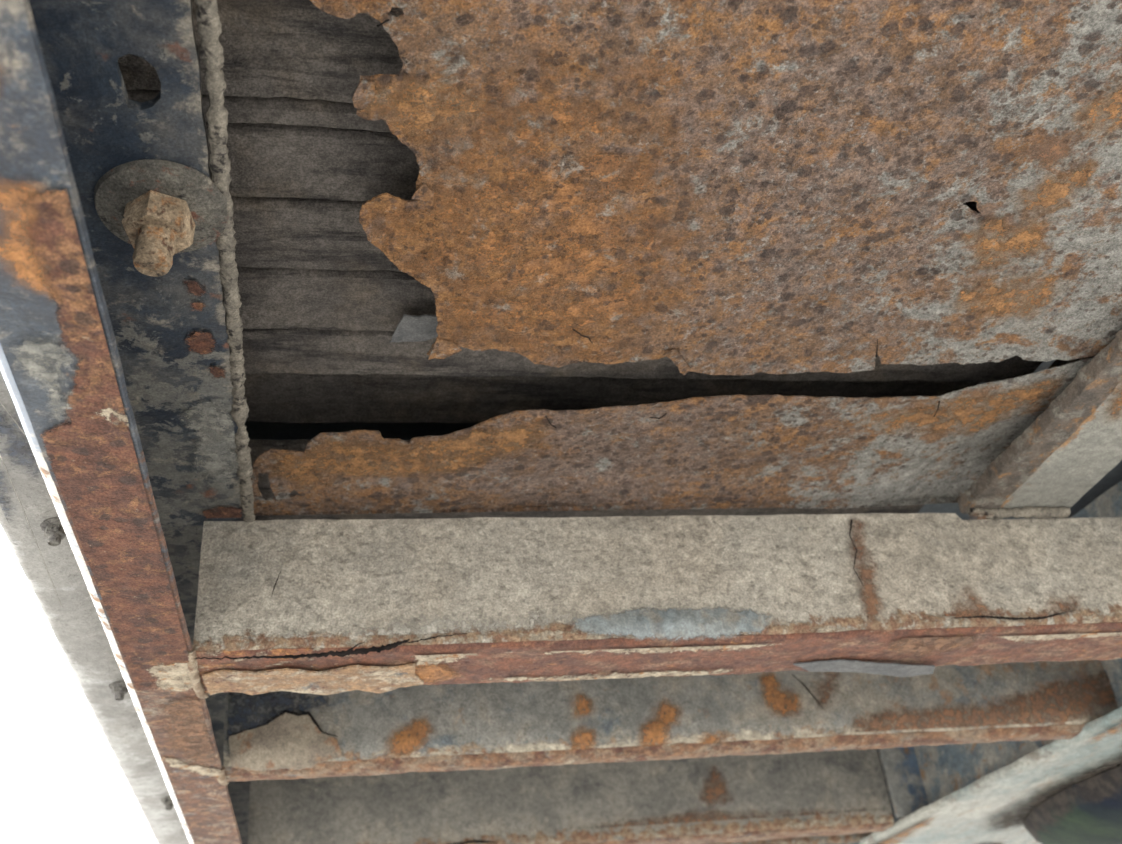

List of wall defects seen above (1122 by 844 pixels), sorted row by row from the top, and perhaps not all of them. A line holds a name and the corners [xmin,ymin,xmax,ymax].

peeling [352,80,375,109]
peeling [411,183,434,202]
corrosion [958,161,1098,320]
peeling [428,338,462,360]
corrosion [873,378,1062,436]
corrosion [0,181,189,691]
corrosion [271,422,548,485]
crack [194,633,467,660]
corrosion [760,674,800,716]
peeling [146,662,424,778]
corrosion [389,719,431,758]
corrosion [641,701,678,746]